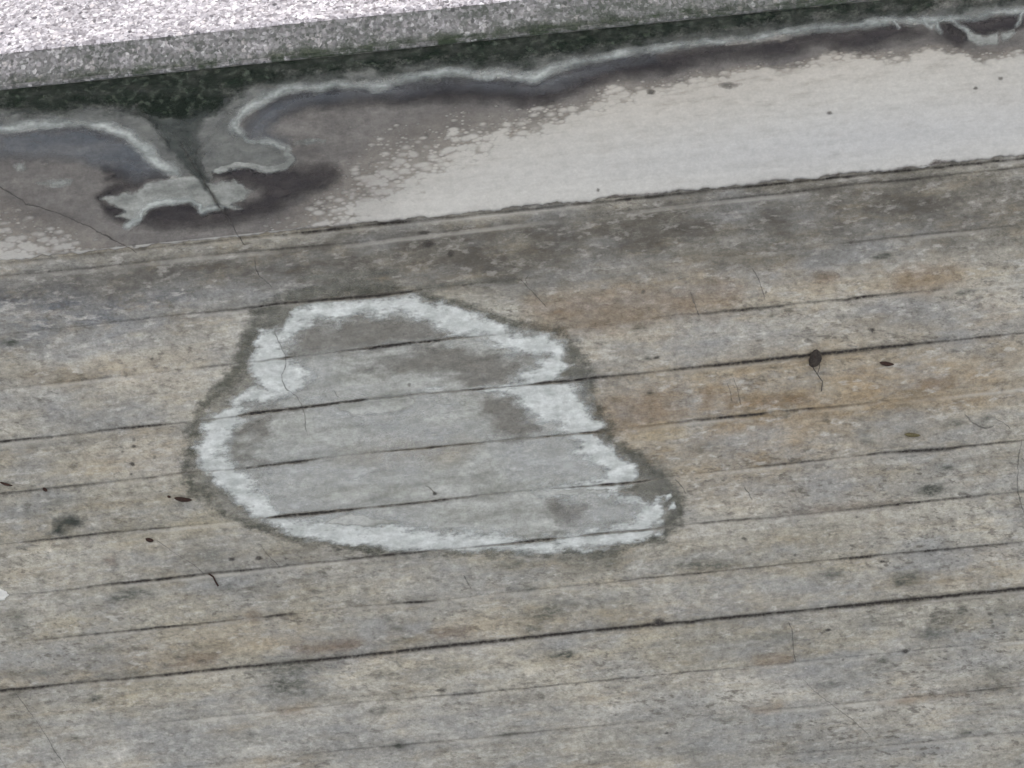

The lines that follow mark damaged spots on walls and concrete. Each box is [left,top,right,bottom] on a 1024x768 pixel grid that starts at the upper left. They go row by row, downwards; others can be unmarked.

crack [0,187,136,253]
crack [179,141,271,286]
water stain [0,0,1024,255]
water stain [182,270,684,561]